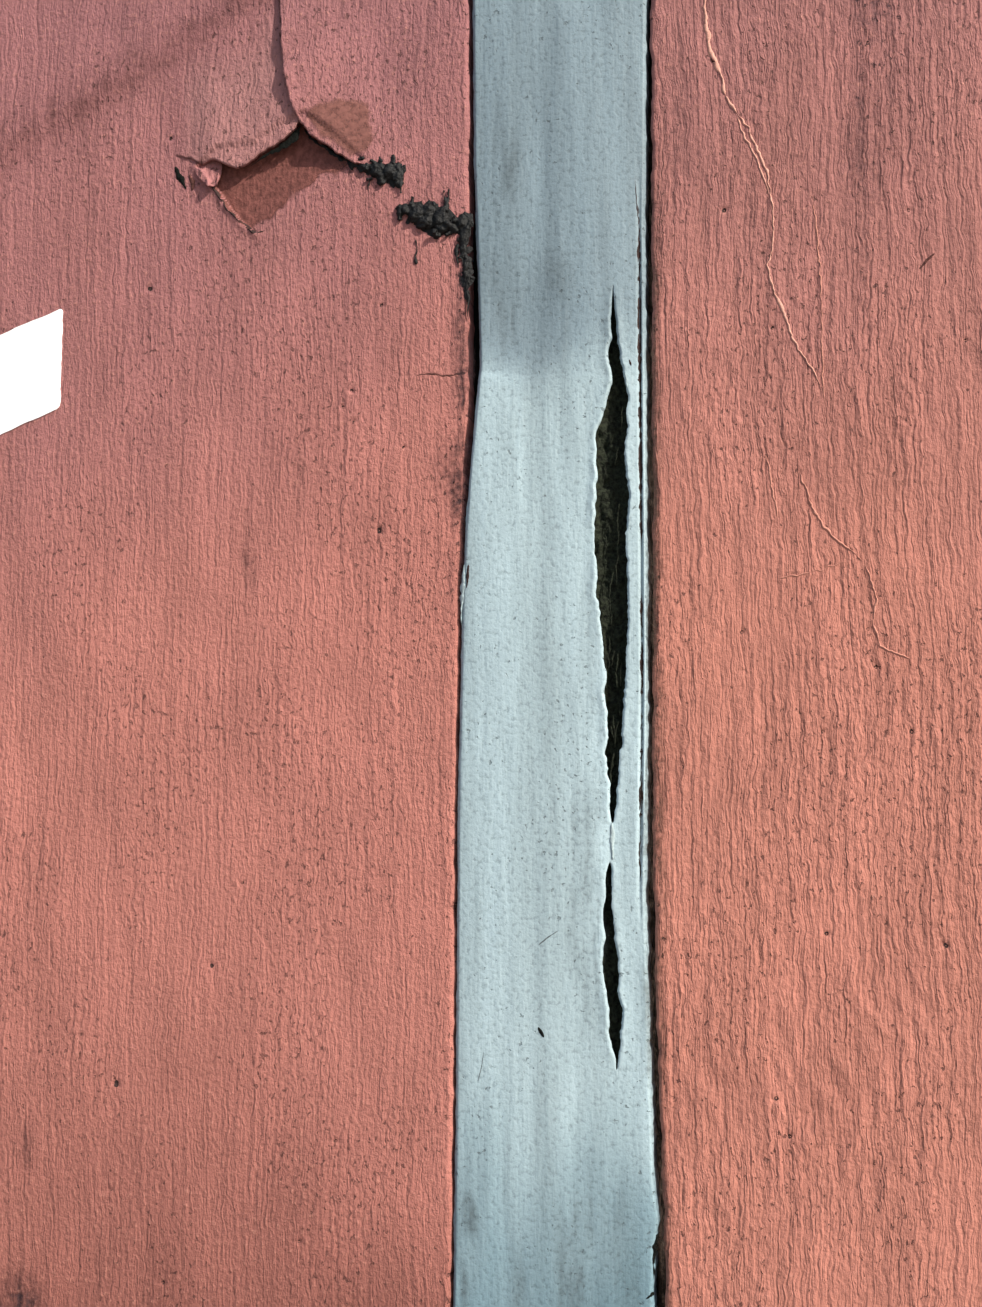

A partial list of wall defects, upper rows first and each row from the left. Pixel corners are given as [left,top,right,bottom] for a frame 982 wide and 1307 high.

flaking render [175,0,420,234]
crack [703,0,826,409]
crack [635,185,643,543]
crack [766,456,910,659]
crack [637,594,645,878]